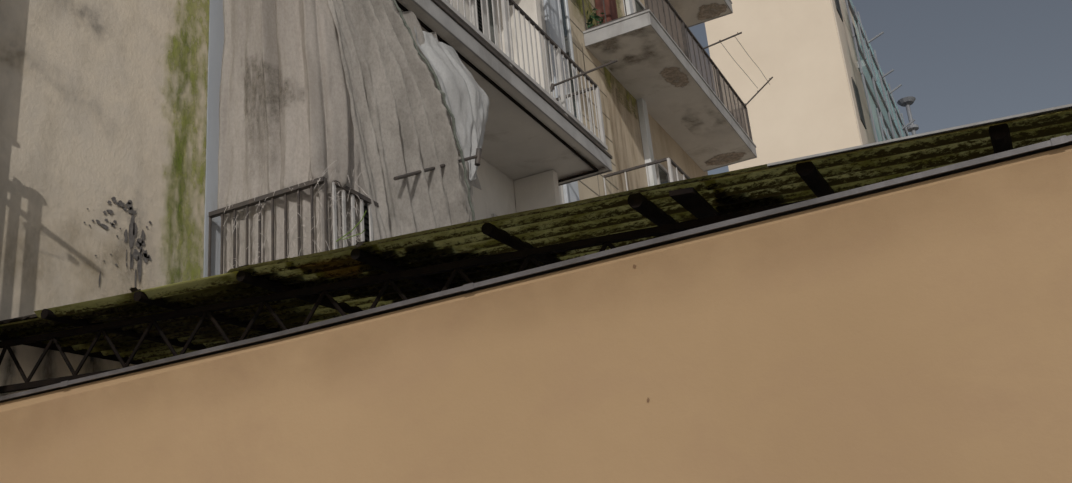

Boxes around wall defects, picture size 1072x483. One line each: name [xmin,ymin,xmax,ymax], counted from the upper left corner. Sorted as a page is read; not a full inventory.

spalling [698,3,727,20]
leakage [170,136,185,237]
spalling [705,152,745,165]
peeling [84,197,152,287]